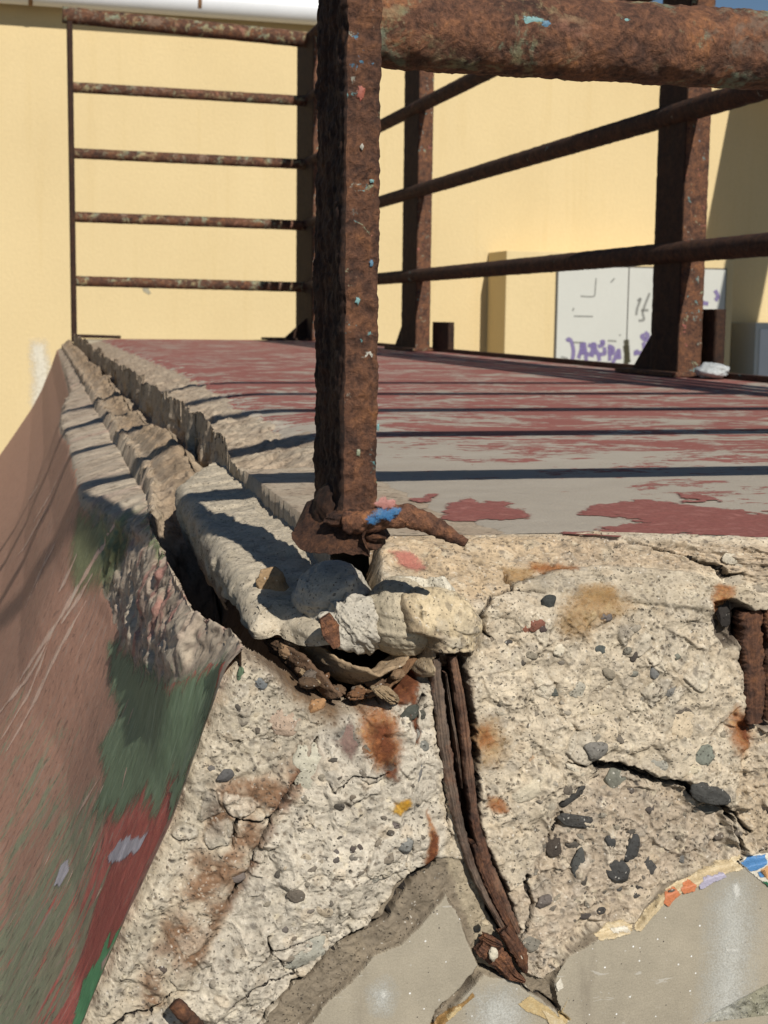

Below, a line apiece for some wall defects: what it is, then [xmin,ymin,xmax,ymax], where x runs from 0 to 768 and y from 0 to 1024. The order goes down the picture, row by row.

spalling [54,334,768,1024]
corrosion [340,709,399,781]
corrosion [730,709,749,752]
crack [577,760,691,794]
corrosion [426,815,439,864]
corrosion [490,797,506,812]
crack [719,805,751,845]
corrosion [473,925,528,983]